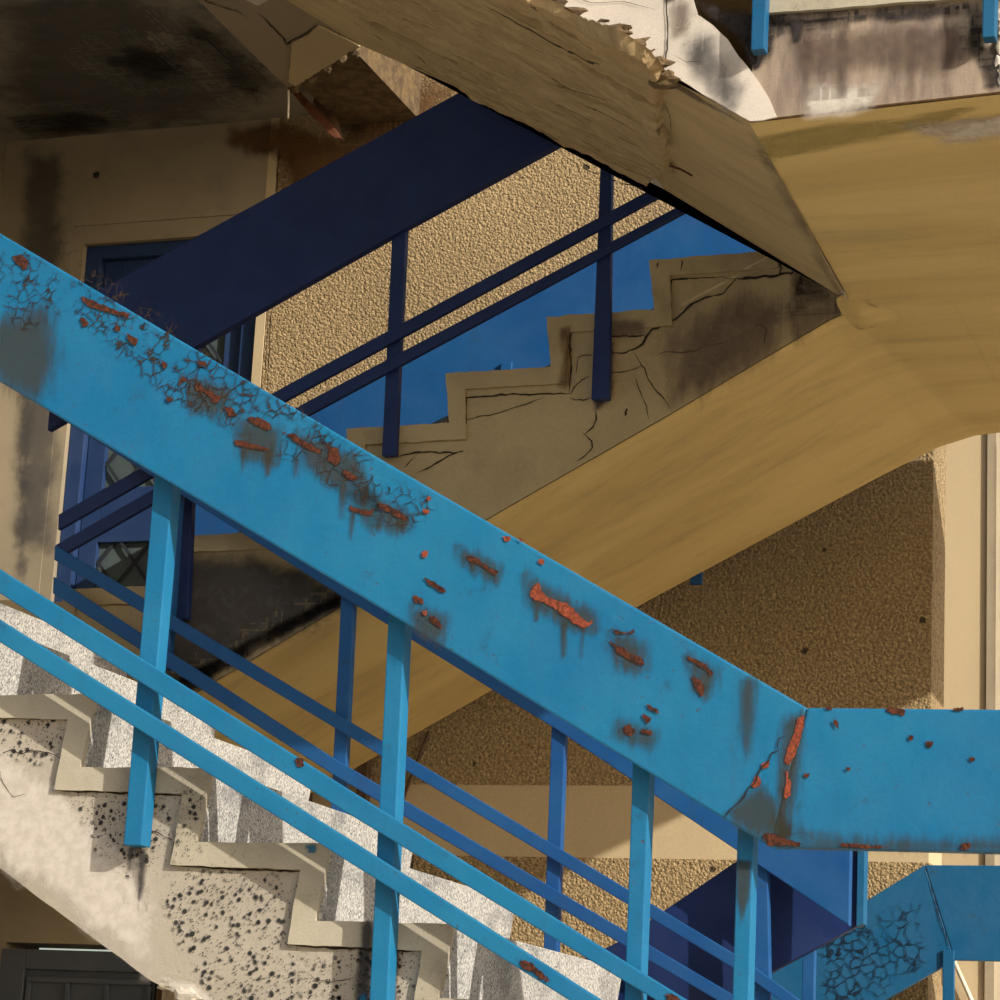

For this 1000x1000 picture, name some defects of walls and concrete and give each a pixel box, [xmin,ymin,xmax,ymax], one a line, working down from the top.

leakage [808,85,880,116]
leakage [706,4,1000,87]
rust [81,296,138,346]
crack [265,309,273,389]
crack [466,261,795,461]
rust [178,377,408,530]
rust [530,582,596,655]
leakage [0,718,203,959]
crack [725,736,784,817]
rust [734,715,810,847]
leakage [166,870,372,1000]
crack [821,869,949,1000]